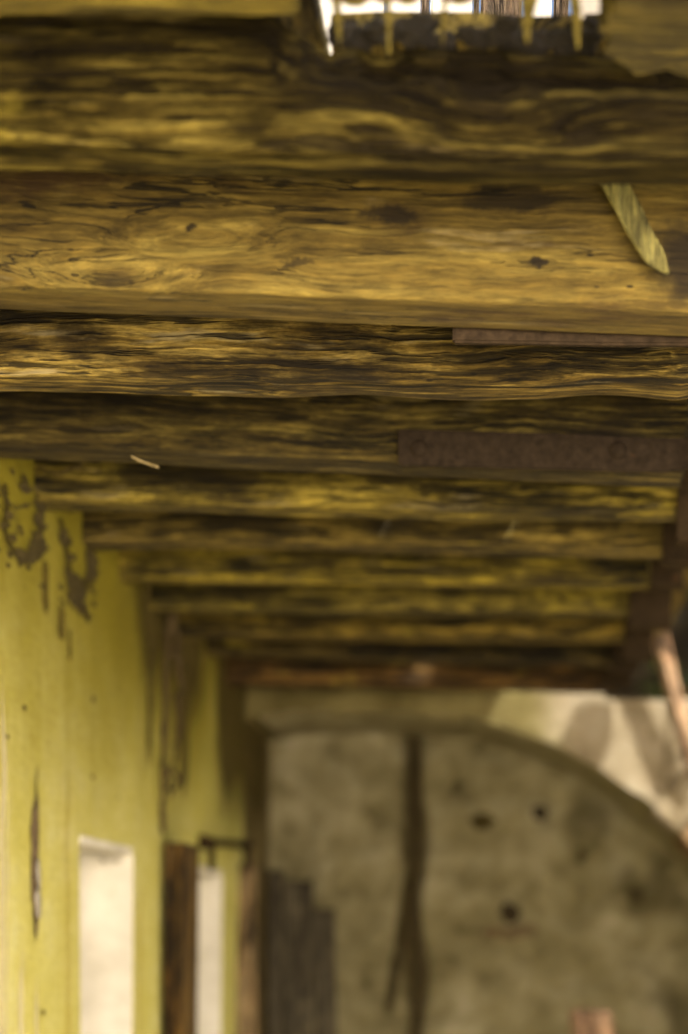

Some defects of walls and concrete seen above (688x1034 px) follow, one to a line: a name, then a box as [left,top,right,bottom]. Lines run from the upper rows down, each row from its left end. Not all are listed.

peeling [0,468,100,623]